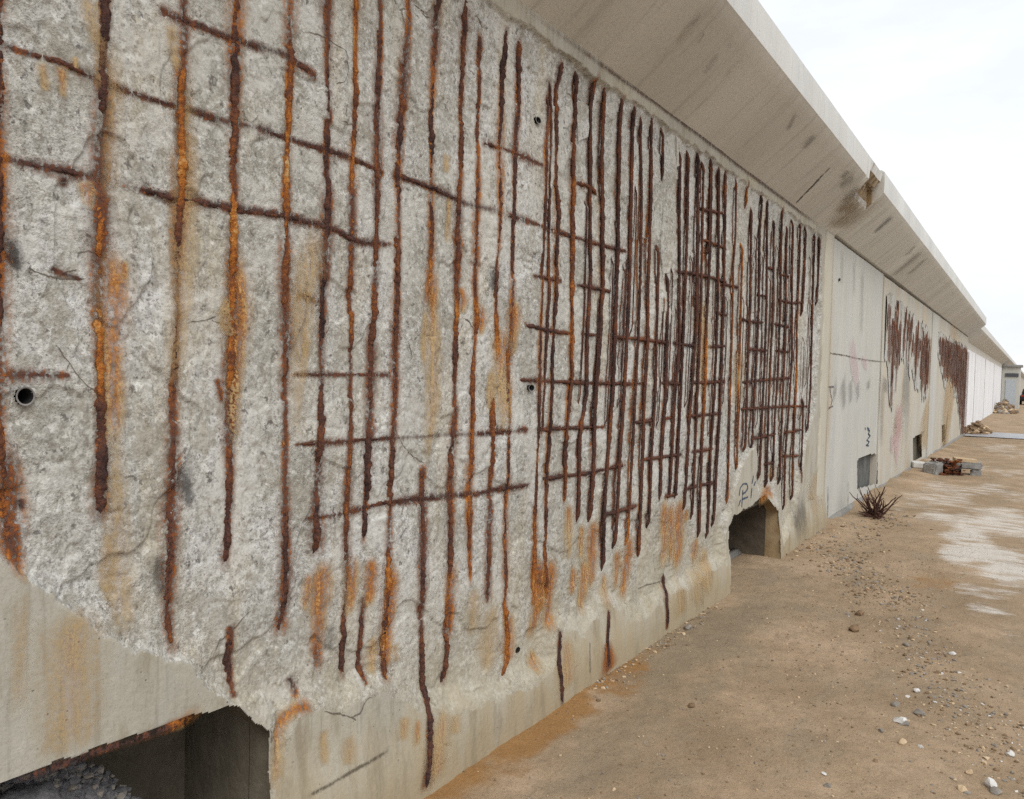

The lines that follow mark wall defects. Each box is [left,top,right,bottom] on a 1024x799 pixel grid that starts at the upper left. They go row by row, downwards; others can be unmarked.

corrosion [167,17,309,67]
corrosion [145,96,368,167]
corrosion [142,151,381,277]
spalling [857,169,880,203]
corrosion [104,262,128,434]
corrosion [380,286,526,450]
spalling [884,293,969,435]
corrosion [0,456,25,575]
corrosion [346,560,398,671]
corrosion [388,488,501,506]
corrosion [445,571,455,633]
corrosion [564,509,633,608]